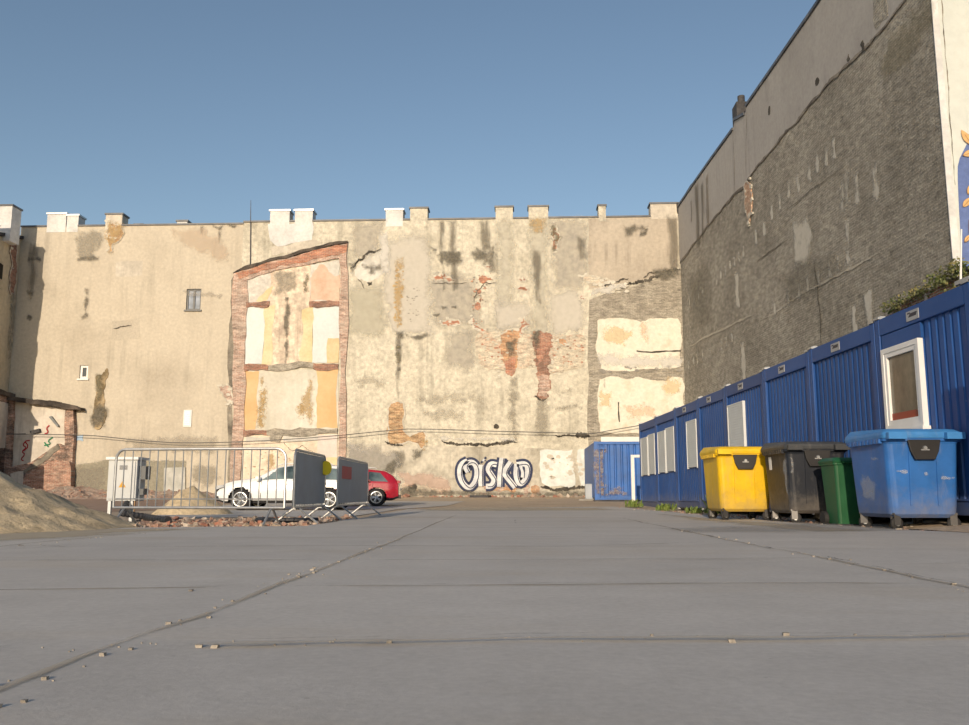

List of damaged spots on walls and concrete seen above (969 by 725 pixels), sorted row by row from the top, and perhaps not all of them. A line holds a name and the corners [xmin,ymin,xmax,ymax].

spalling [104,220,124,253]
peeling [350,249,384,288]
spalling [439,263,586,401]
spalling [598,365,682,374]
spalling [90,368,109,430]
spalling [385,400,427,450]